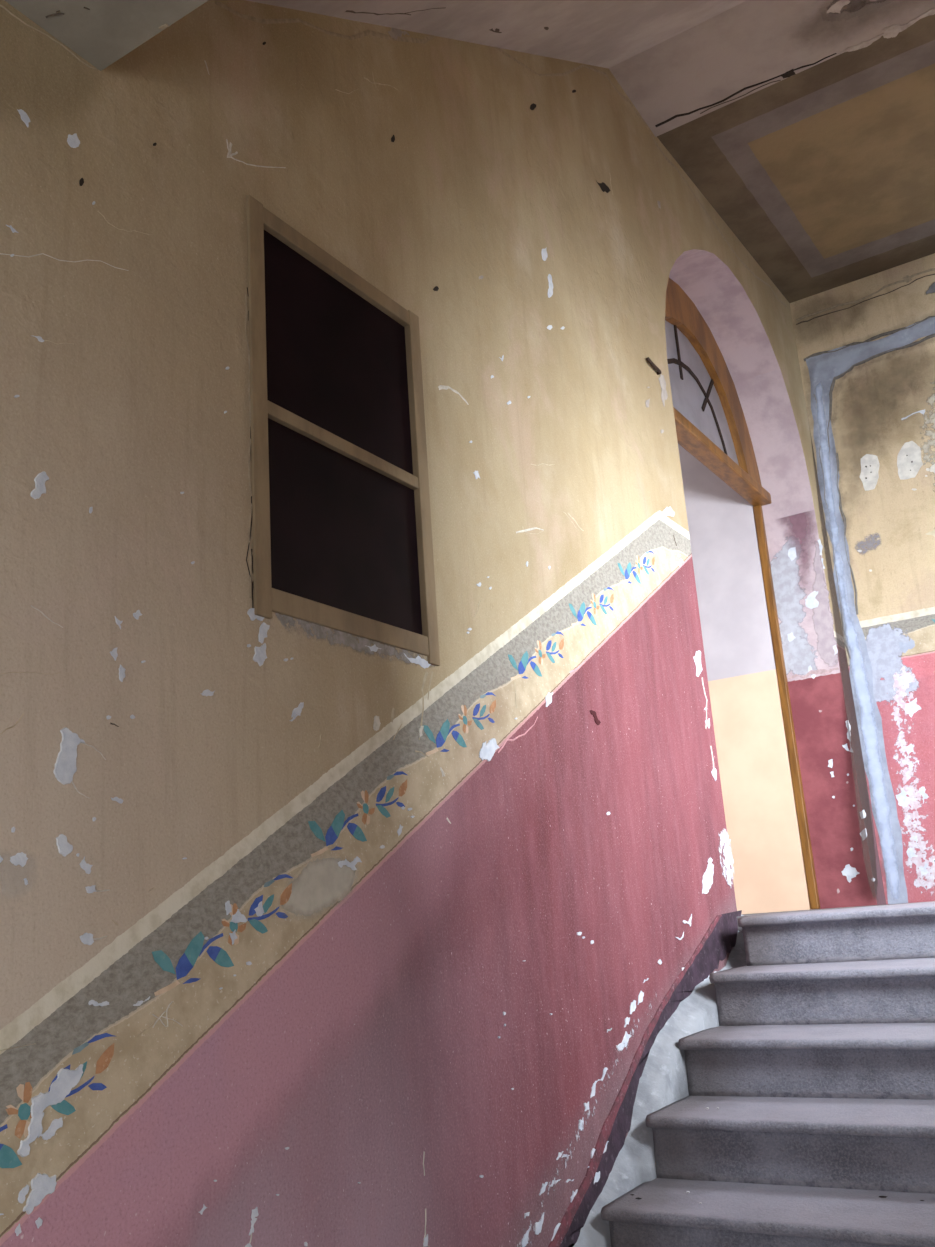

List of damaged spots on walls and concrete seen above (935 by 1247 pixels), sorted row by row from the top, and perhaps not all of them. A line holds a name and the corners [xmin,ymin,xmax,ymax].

peeling [827,0,884,13]
crack [655,53,837,127]
peeling [920,382,935,485]
peeling [856,534,881,554]
peeling [247,608,270,666]
peeling [53,727,106,798]
peeling [17,1064,83,1157]
peeling [517,978,657,1247]
peeling [15,1173,57,1236]